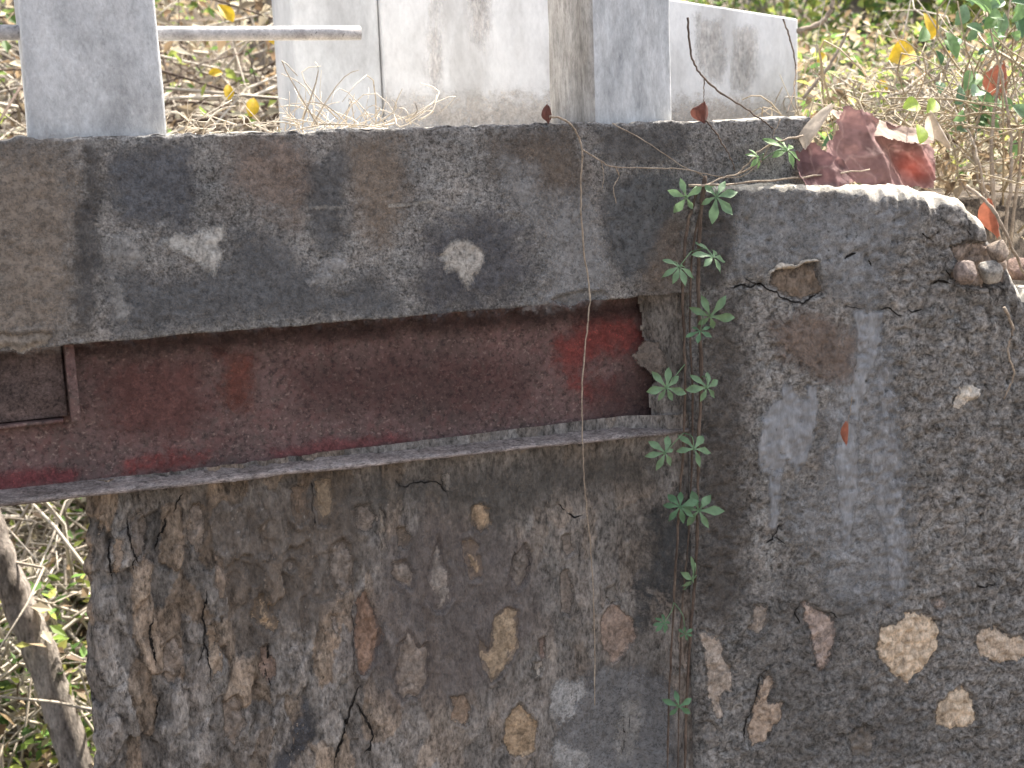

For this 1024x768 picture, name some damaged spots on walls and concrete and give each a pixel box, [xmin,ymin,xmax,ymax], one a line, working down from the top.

damp [76,145,192,323]
rust [61,304,640,358]
damp [419,213,531,313]
damp [541,125,687,302]
crack [725,279,818,304]
damp [834,421,860,551]
crack [107,494,183,577]
crack [334,594,374,766]
flaking render [747,675,784,746]
flaking render [800,601,836,671]
flaking render [876,597,947,683]
flaking render [976,625,1024,663]